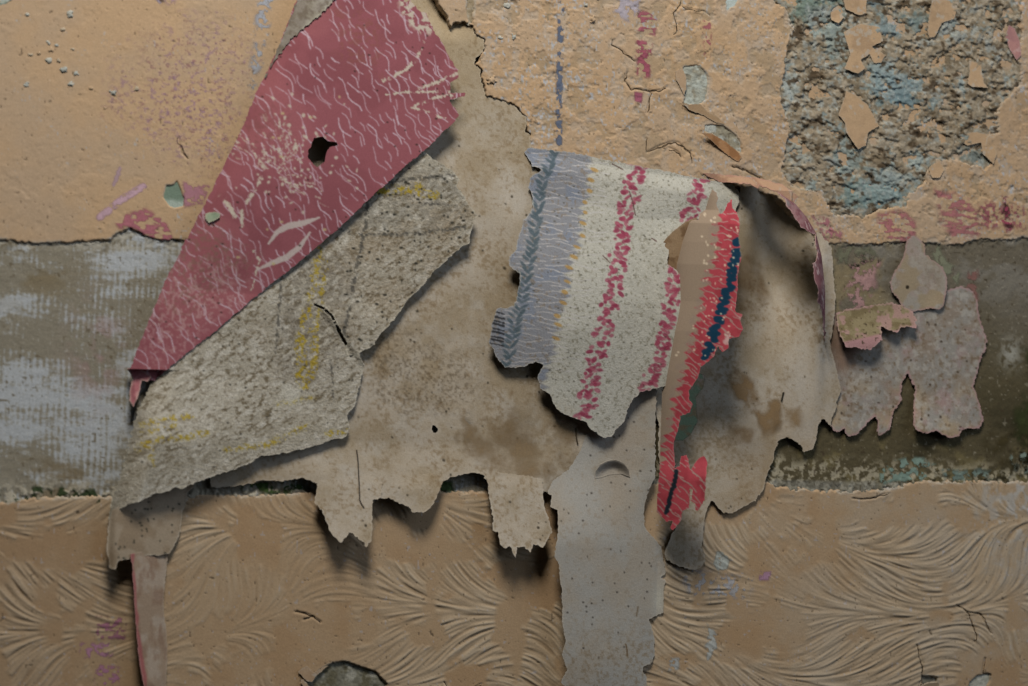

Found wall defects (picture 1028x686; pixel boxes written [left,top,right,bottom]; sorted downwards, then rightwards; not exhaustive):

spalling [774,0,1022,219]
peeling [164,182,184,208]
peeling [205,212,220,223]
peeling [0,229,185,504]
peeling [765,237,1028,493]
peeling [675,374,705,440]
peeling [187,478,317,498]
peeling [440,473,488,493]
peeling [652,425,660,485]
crack [958,605,992,676]
peeling [298,661,386,686]